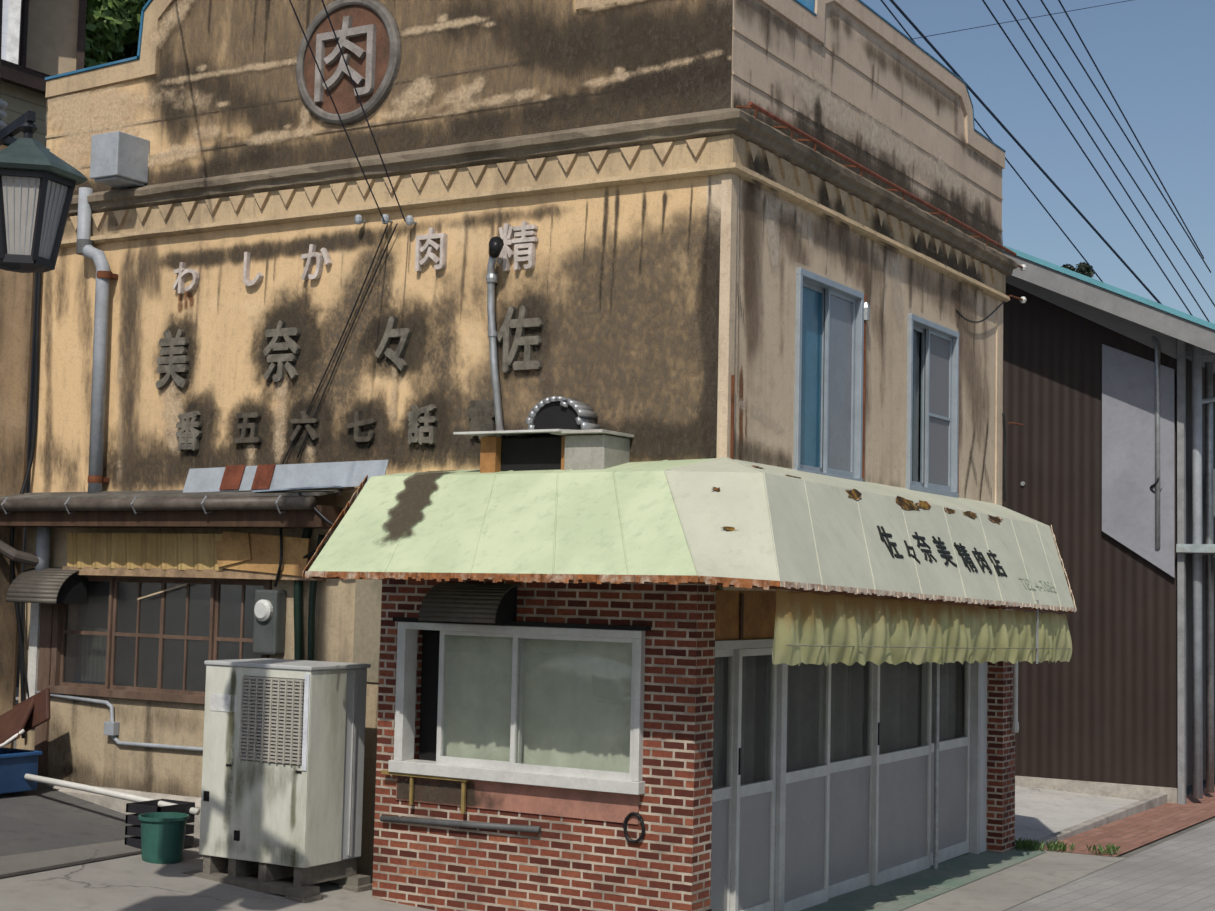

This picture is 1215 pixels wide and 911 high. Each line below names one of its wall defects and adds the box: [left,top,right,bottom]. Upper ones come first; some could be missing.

water stain [152,0,341,169]
water stain [377,0,795,117]
water stain [866,42,997,168]
water stain [45,272,64,368]
water stain [103,181,721,491]
water stain [736,181,986,440]
water stain [45,416,75,492]
water stain [734,437,792,468]
water stain [0,533,19,691]